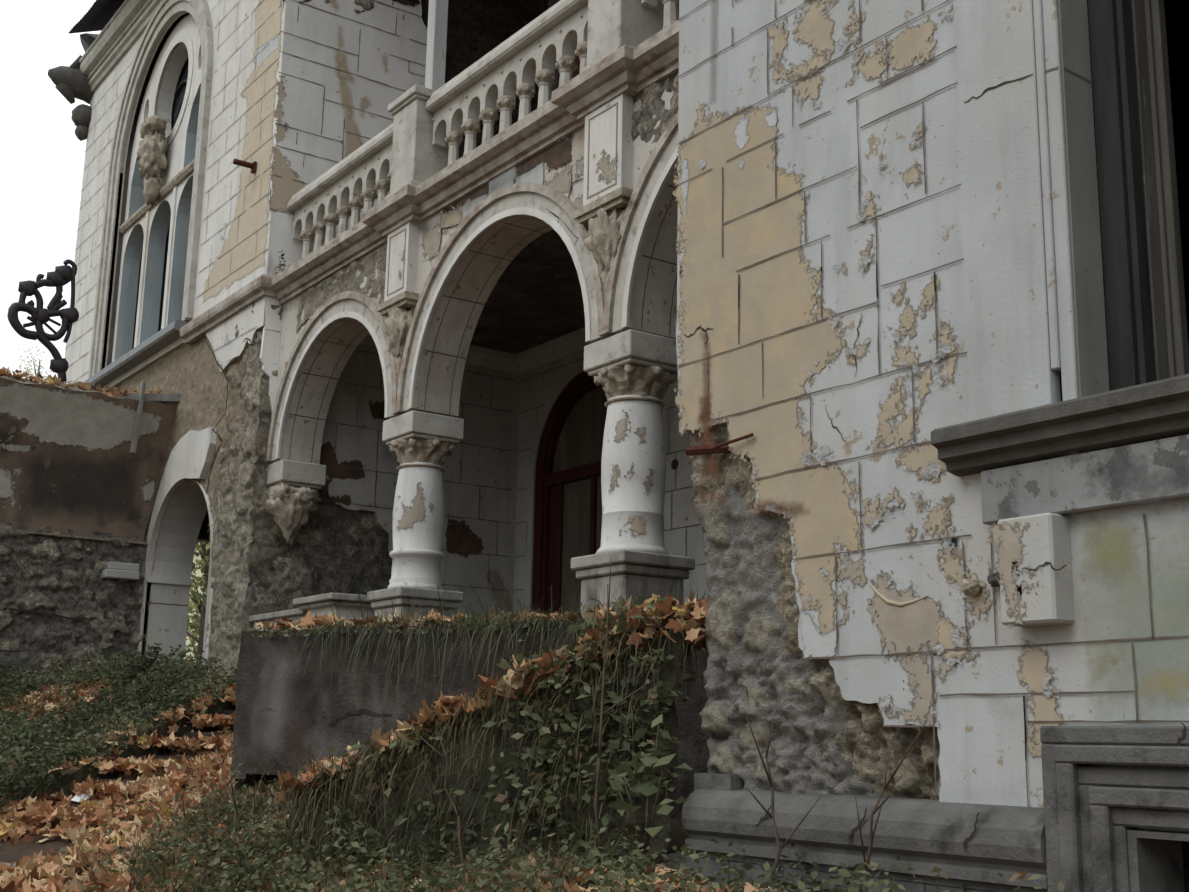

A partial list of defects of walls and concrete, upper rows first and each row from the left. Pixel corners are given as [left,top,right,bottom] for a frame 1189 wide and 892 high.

spalling [393,0,429,29]
spalling [445,0,548,84]
peeling [203,0,331,302]
spalling [458,83,539,158]
crack [964,74,1033,103]
peeling [0,383,162,454]
rust [700,335,718,478]
peeling [673,0,1064,800]
damp [31,460,133,513]
peeling [396,482,435,530]
peeling [445,519,483,558]
crack [1021,562,1068,571]